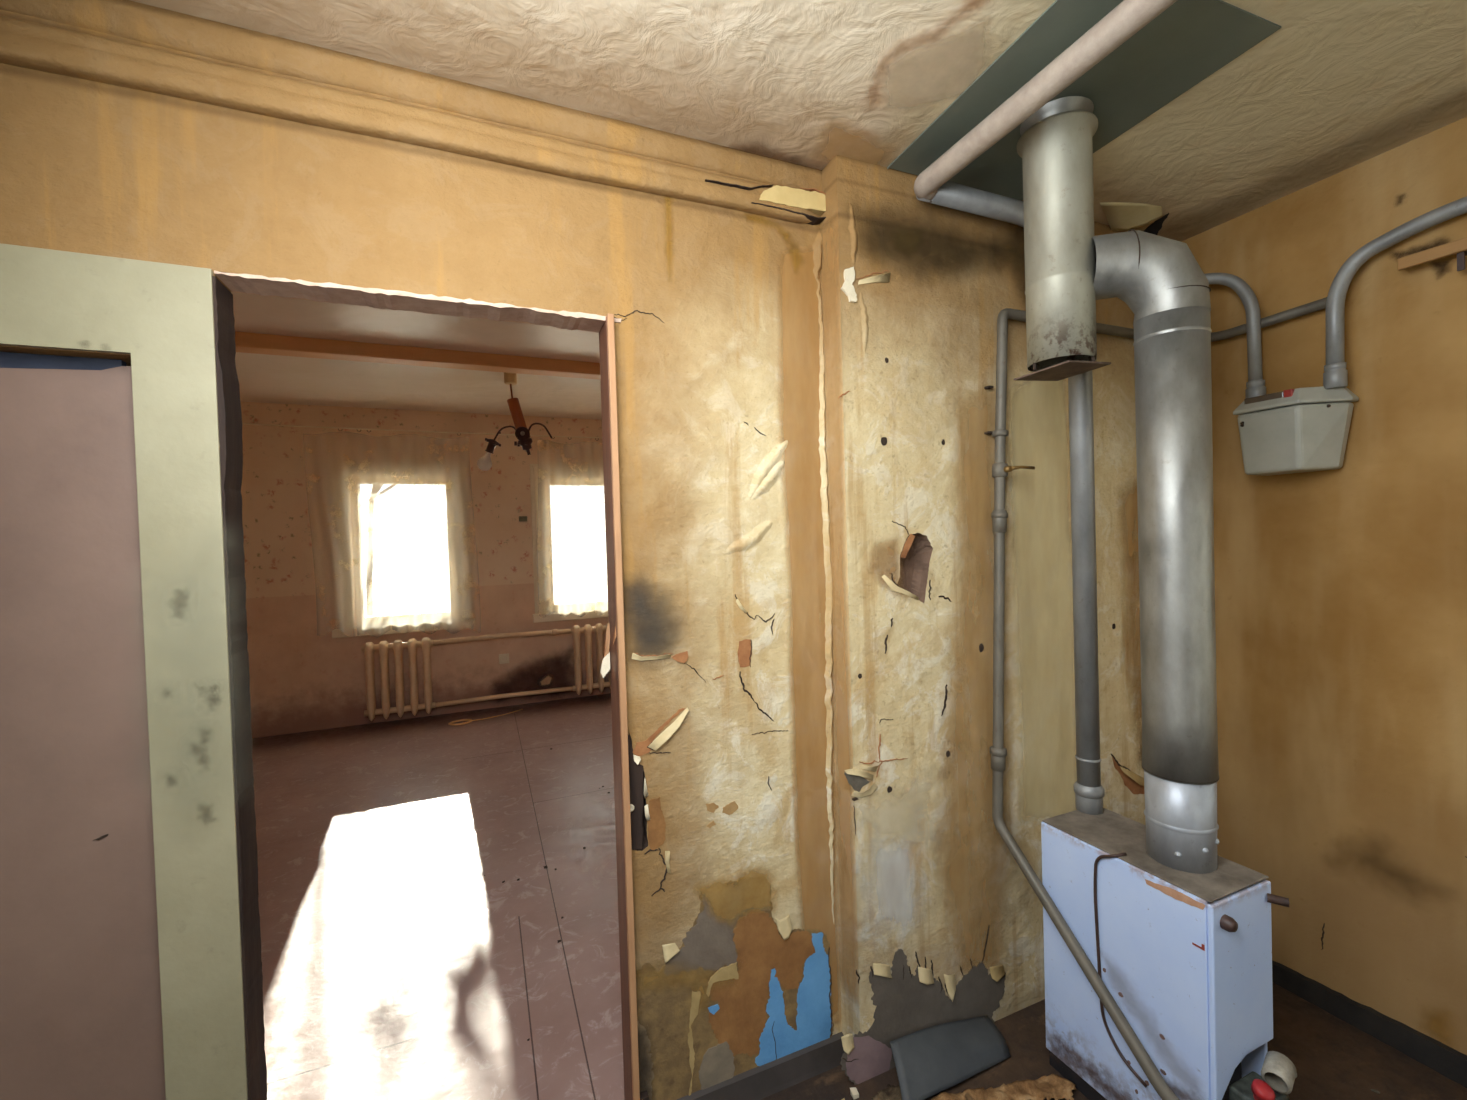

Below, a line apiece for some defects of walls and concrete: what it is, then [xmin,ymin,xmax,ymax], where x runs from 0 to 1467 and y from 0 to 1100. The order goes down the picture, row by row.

damp [889,26,982,105]
damp [735,129,883,171]
flaking render [875,521,952,603]
damp [495,657,570,700]
crack [633,594,788,735]
flaking render [628,733,666,851]
peeling [636,871,1006,1100]